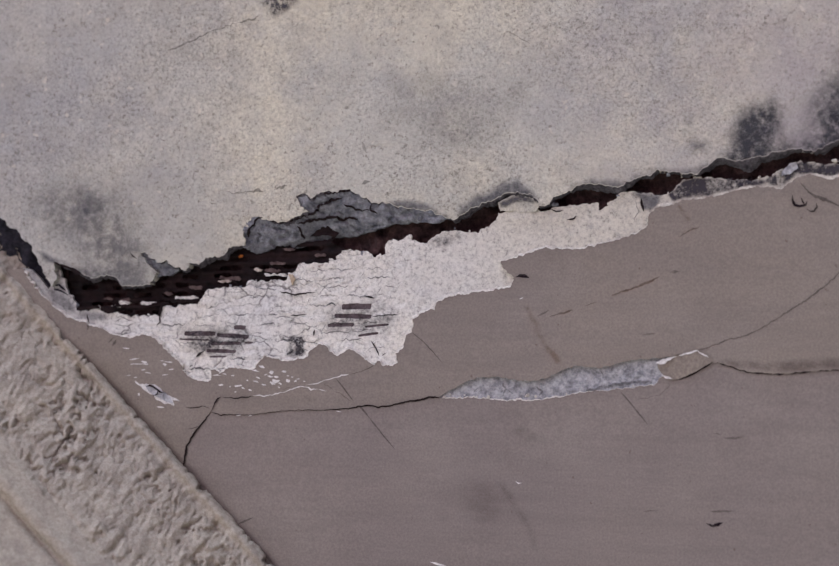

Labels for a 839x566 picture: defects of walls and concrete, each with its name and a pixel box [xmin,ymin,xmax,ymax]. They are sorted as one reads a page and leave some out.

leakage [728,103,779,160]
leakage [803,81,839,151]
peeling [23,160,839,393]
spalling [128,358,179,408]
spalling [440,349,712,401]
crack [681,332,839,379]
crack [183,374,439,466]